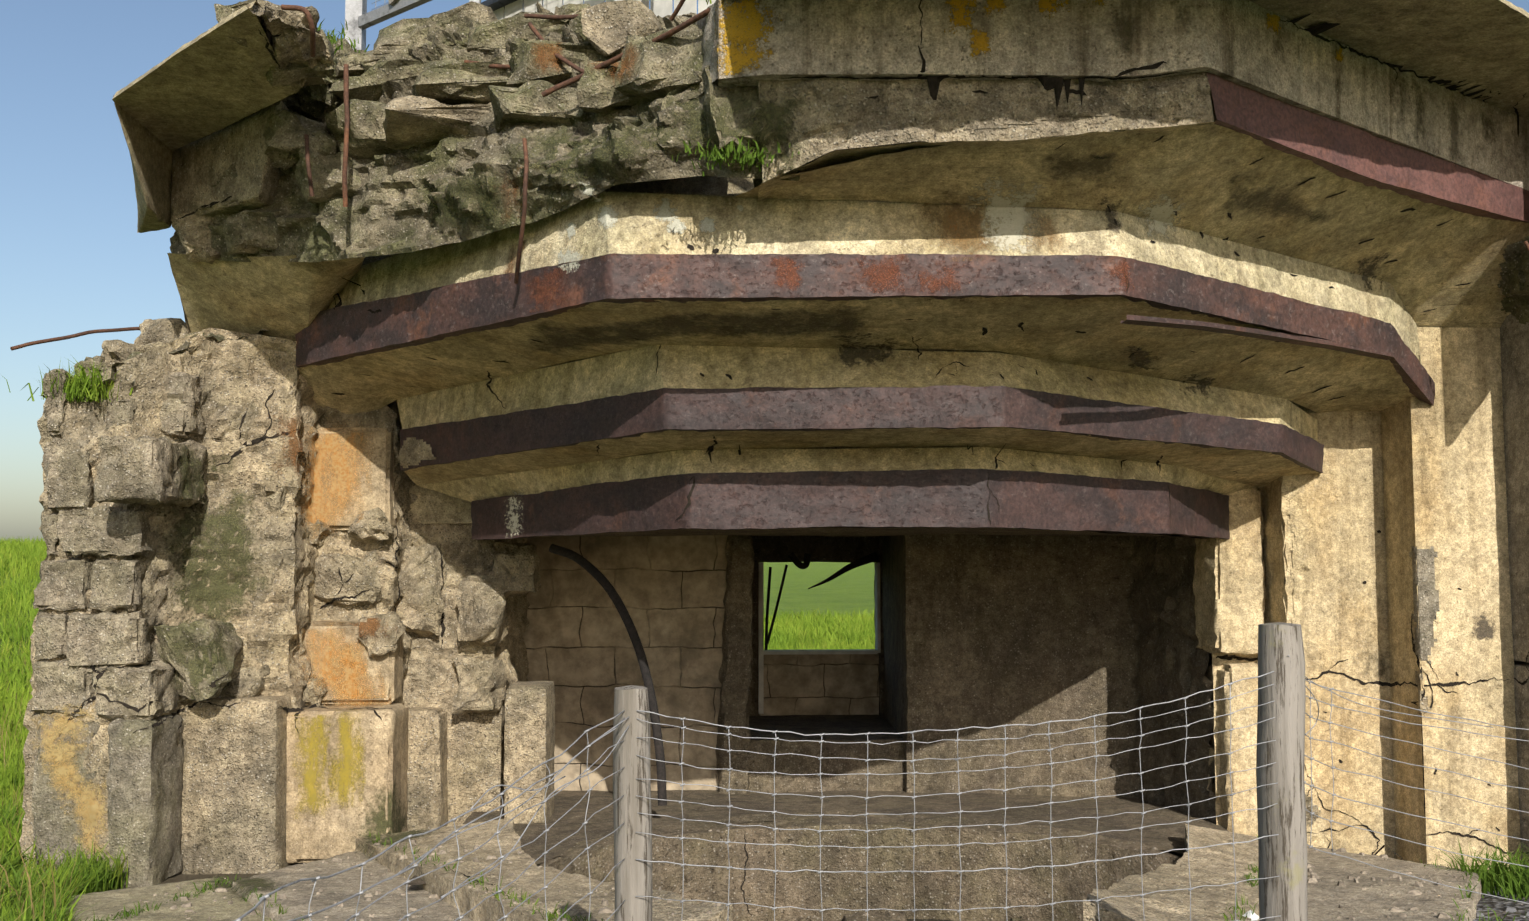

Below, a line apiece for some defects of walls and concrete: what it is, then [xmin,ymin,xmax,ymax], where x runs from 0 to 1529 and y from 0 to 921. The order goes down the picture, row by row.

spalling [281,4,316,57]
spalling [524,14,623,97]
spalling [652,0,711,43]
crack [1281,12,1527,137]
spalling [342,64,350,207]
spalling [514,138,529,284]
crack [1216,654,1258,662]
crack [1305,611,1529,714]
crack [1304,764,1528,860]